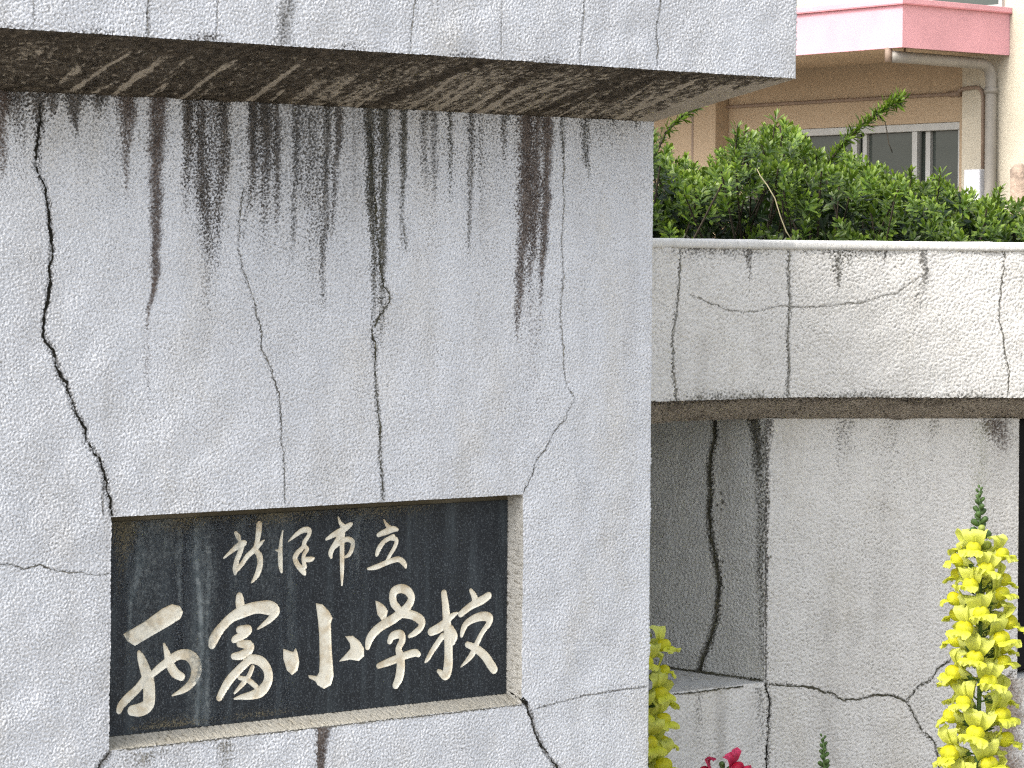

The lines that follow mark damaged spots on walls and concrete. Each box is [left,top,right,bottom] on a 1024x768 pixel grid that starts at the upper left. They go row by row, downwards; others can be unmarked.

crack [32,101,113,516]
crack [237,188,285,500]
crack [370,134,391,500]
water stain [0,0,781,333]
crack [523,133,574,494]
crack [671,250,929,400]
crack [998,251,1010,391]
crack [0,563,110,576]
crack [98,686,646,768]
crack [660,420,949,768]